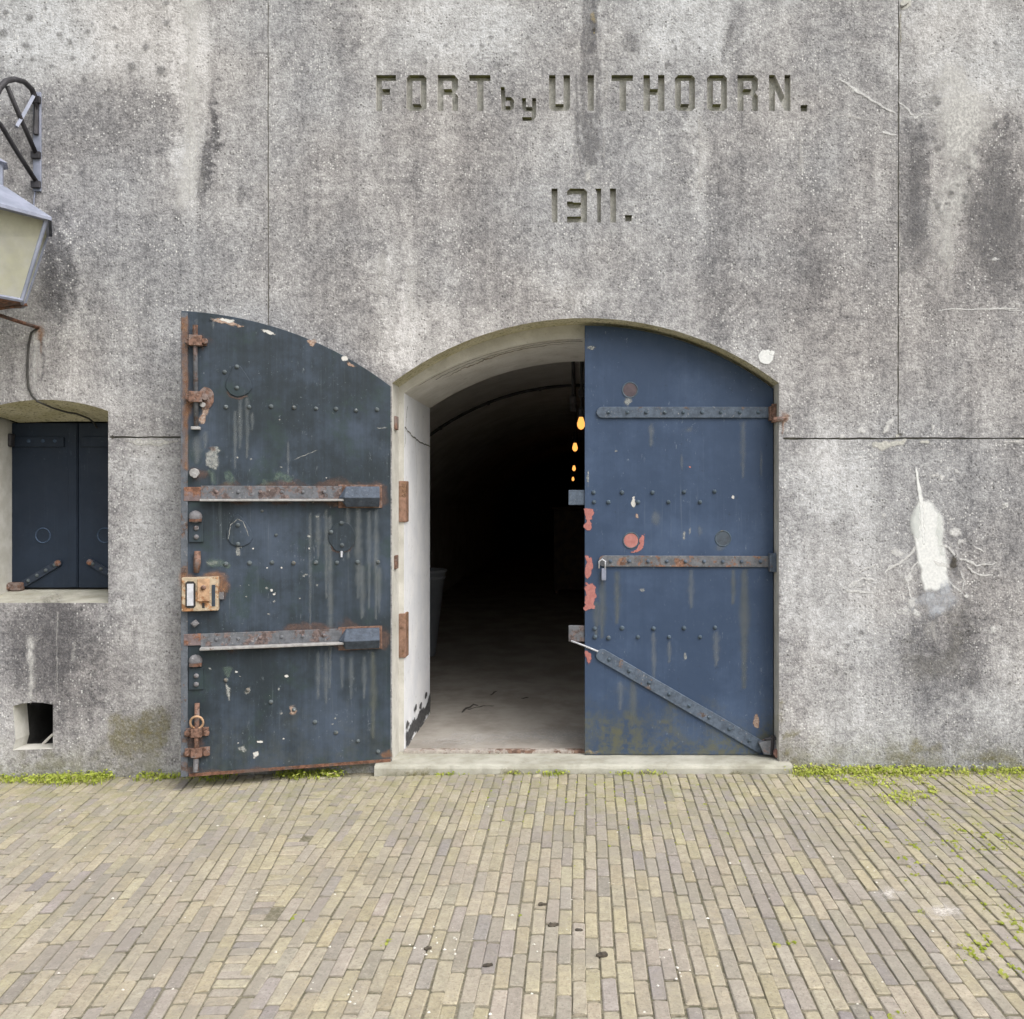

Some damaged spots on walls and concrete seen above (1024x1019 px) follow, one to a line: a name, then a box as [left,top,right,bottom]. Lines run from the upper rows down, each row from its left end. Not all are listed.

water stain [912,62,998,258]
water stain [846,468,969,616]